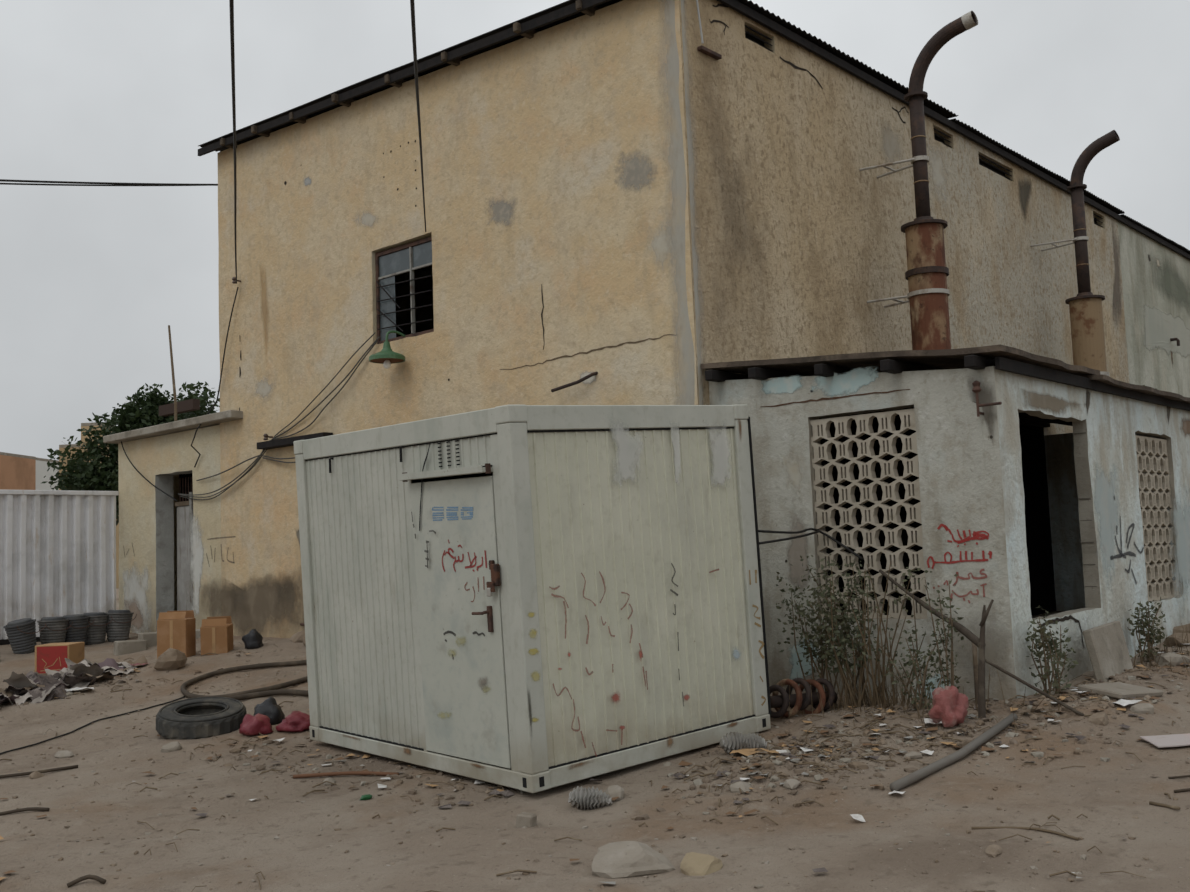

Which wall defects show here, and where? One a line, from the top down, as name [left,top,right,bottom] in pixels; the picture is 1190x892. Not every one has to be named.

crack [500,284,677,370]
peeling [762,367,878,396]
damp [204,578,305,635]